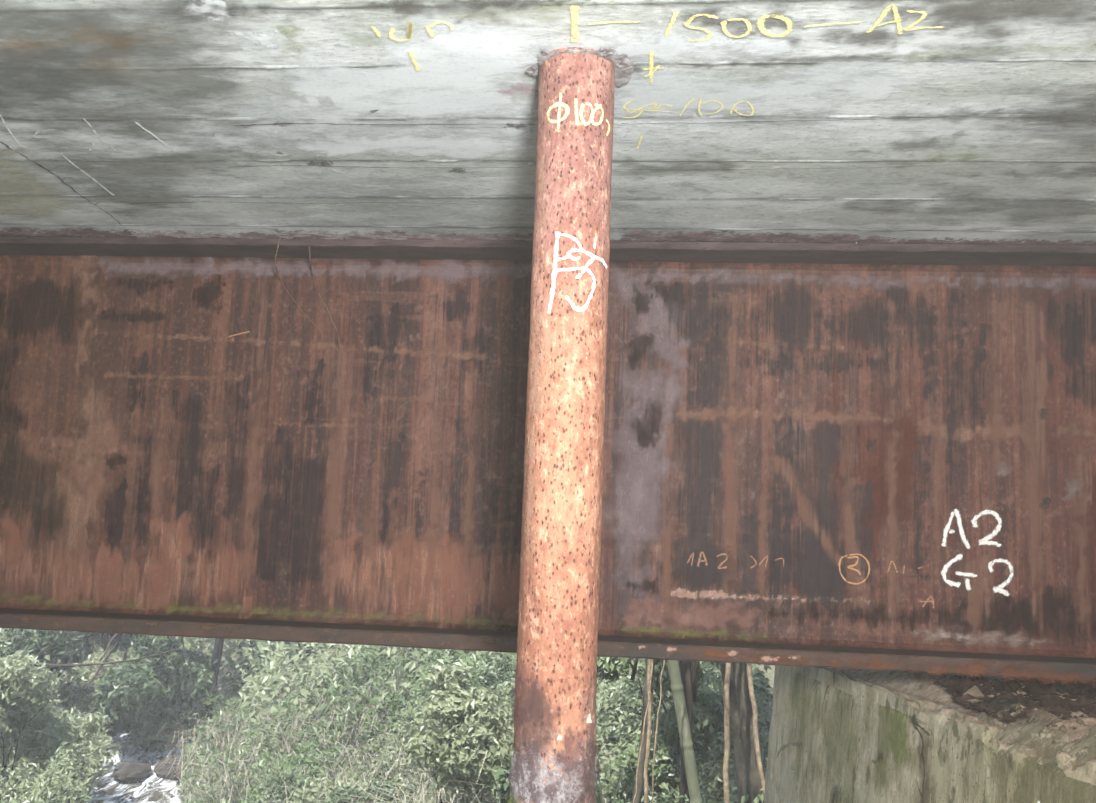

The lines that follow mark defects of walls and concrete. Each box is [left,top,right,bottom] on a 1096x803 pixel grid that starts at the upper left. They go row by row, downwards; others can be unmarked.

leakage [0,0,235,132]
leakage [62,134,255,208]
leakage [281,0,543,159]
leakage [641,160,733,173]
leakage [599,9,909,115]
leakage [928,0,1081,35]
leakage [951,194,1095,226]
leakage [1030,103,1096,127]
corrosion [0,283,268,618]
corrosion [323,302,533,626]
corrosion [627,282,1096,646]
leakage [991,740,1096,803]